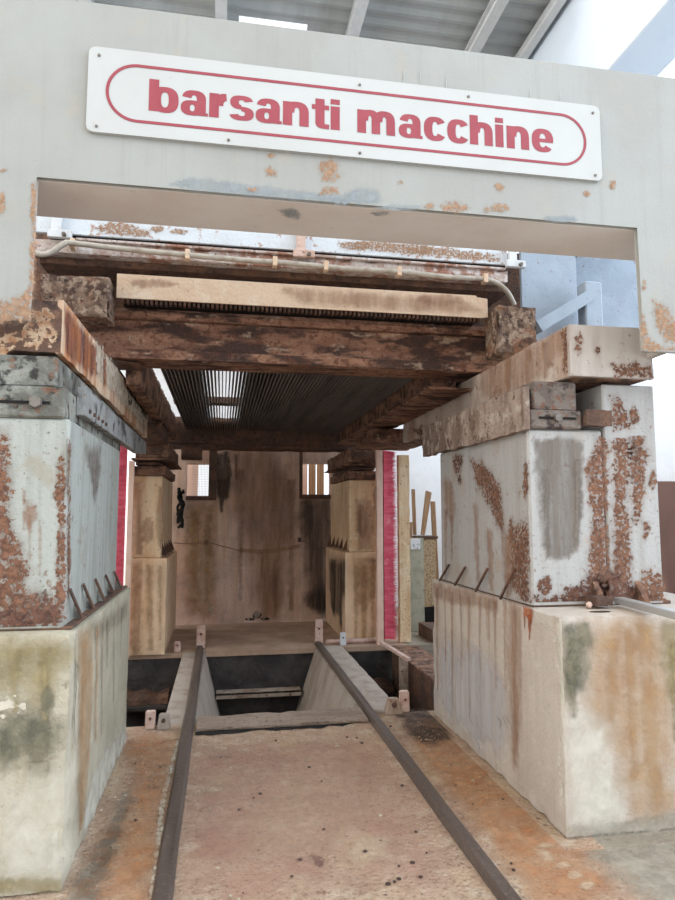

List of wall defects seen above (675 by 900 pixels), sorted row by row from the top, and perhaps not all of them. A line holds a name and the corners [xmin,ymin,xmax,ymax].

rust [319,157,340,195]
rust [0,183,37,326]
rust [610,361,654,379]
rust [640,300,675,352]
rust [0,426,67,627]
rust [446,395,667,640]
damp [0,643,71,771]
damp [564,624,591,704]